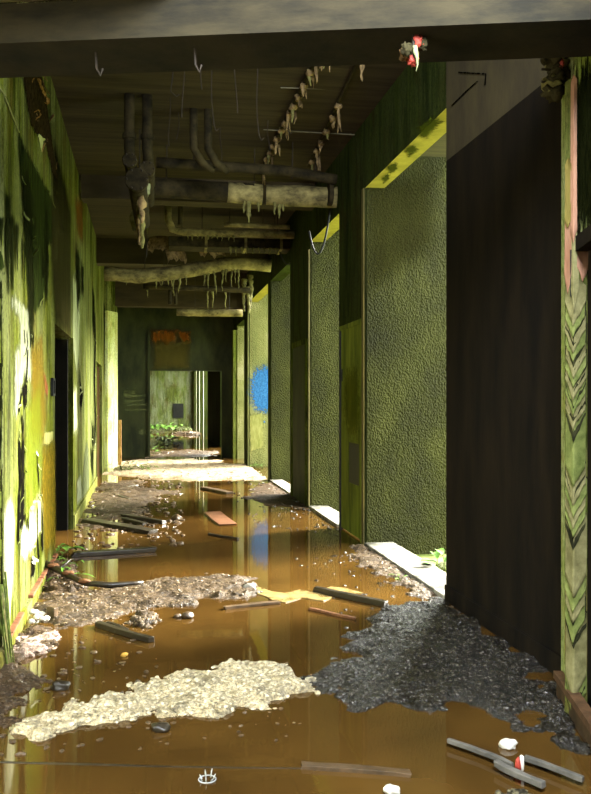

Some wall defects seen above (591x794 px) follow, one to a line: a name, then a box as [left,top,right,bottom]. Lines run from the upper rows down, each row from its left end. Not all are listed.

damp [0,147,107,375]
damp [41,441,56,550]
damp [4,501,15,611]